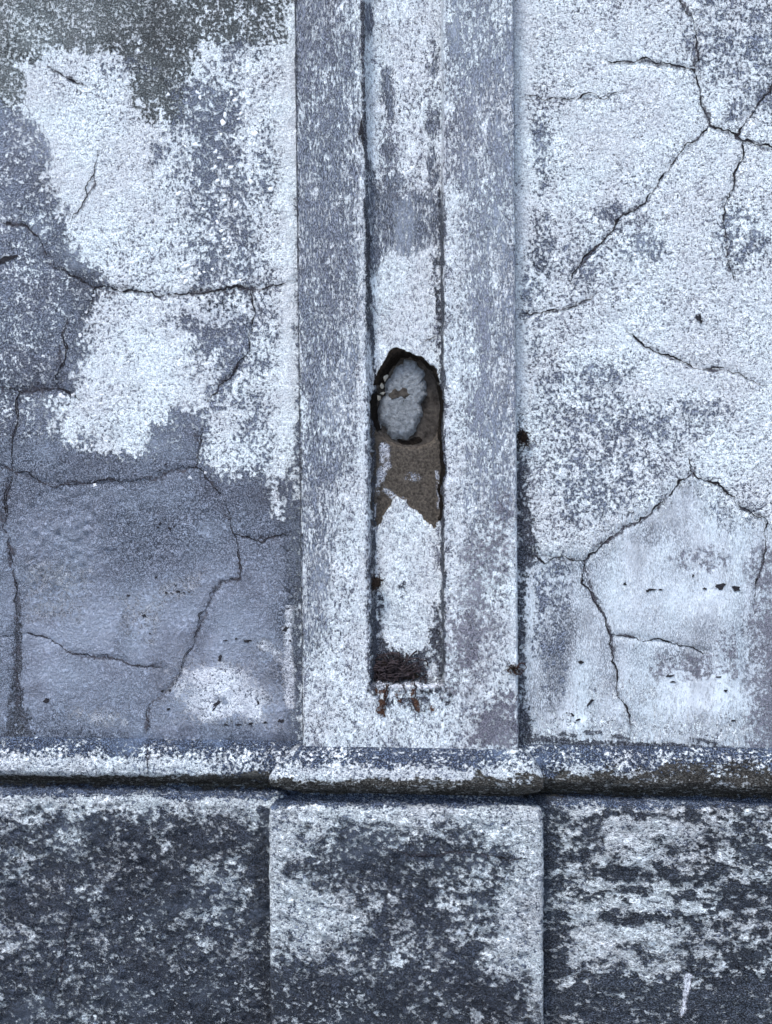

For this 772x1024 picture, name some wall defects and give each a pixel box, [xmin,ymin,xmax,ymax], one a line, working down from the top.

crack [47,66,88,87]
crack [71,151,99,221]
crack [519,0,772,316]
crack [0,222,294,772]
spalling [370,347,446,528]
crack [628,332,764,386]
crack [526,460,769,733]
rust [375,681,435,717]